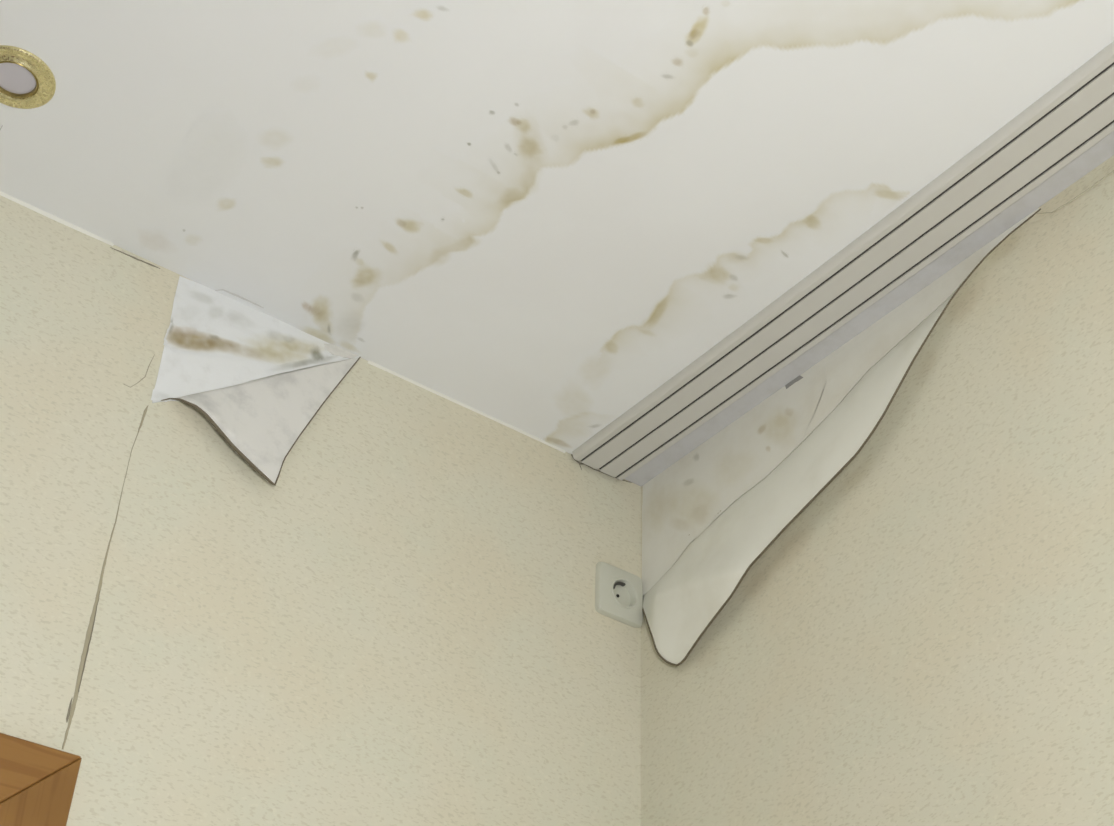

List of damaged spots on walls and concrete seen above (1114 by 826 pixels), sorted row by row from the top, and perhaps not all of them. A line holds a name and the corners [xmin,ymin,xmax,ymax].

flaking render [152,276,359,403]
leakage [163,0,1086,373]
leakage [541,181,912,454]
crack [62,354,155,749]